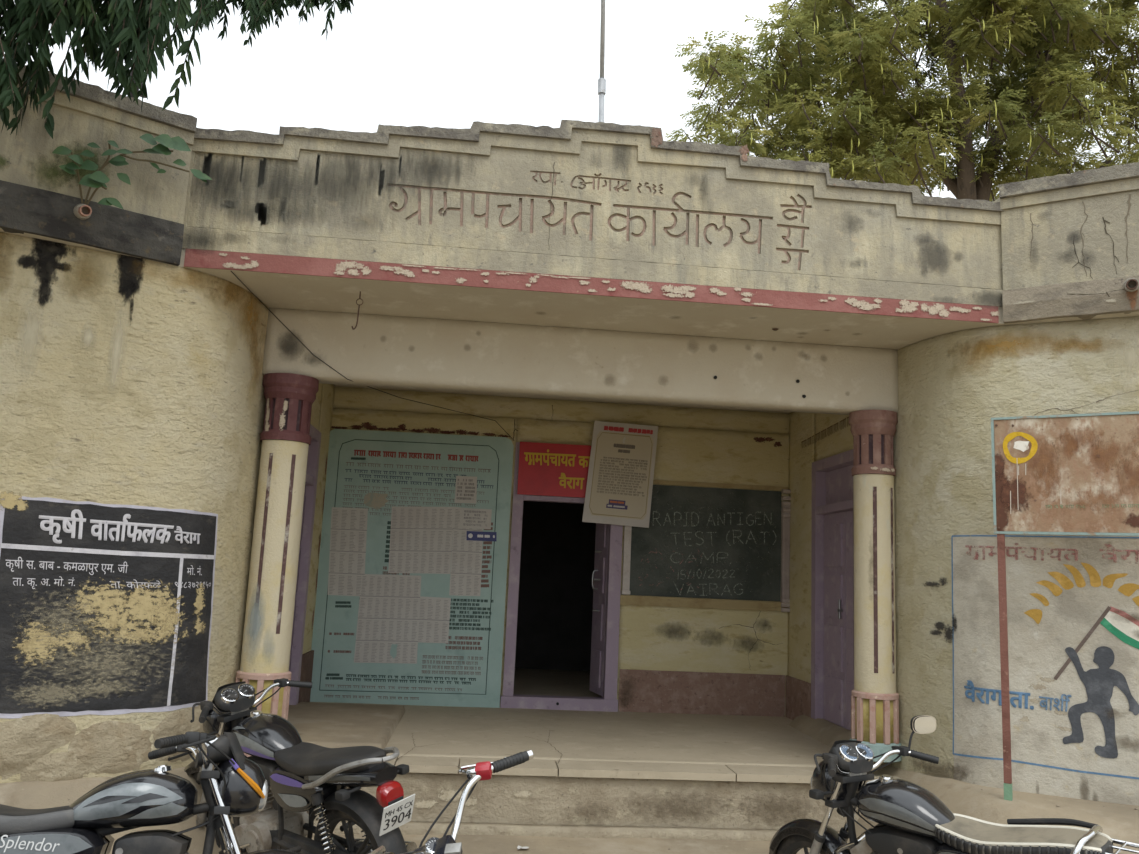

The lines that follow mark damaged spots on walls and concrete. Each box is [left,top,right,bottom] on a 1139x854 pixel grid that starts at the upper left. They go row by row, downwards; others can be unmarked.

crack [1069,194,1131,297]
water stain [18,238,92,348]
water stain [113,254,145,373]
peeling [334,260,696,298]
peeling [710,287,770,306]
peeling [265,398,288,431]
water stain [931,617,957,643]